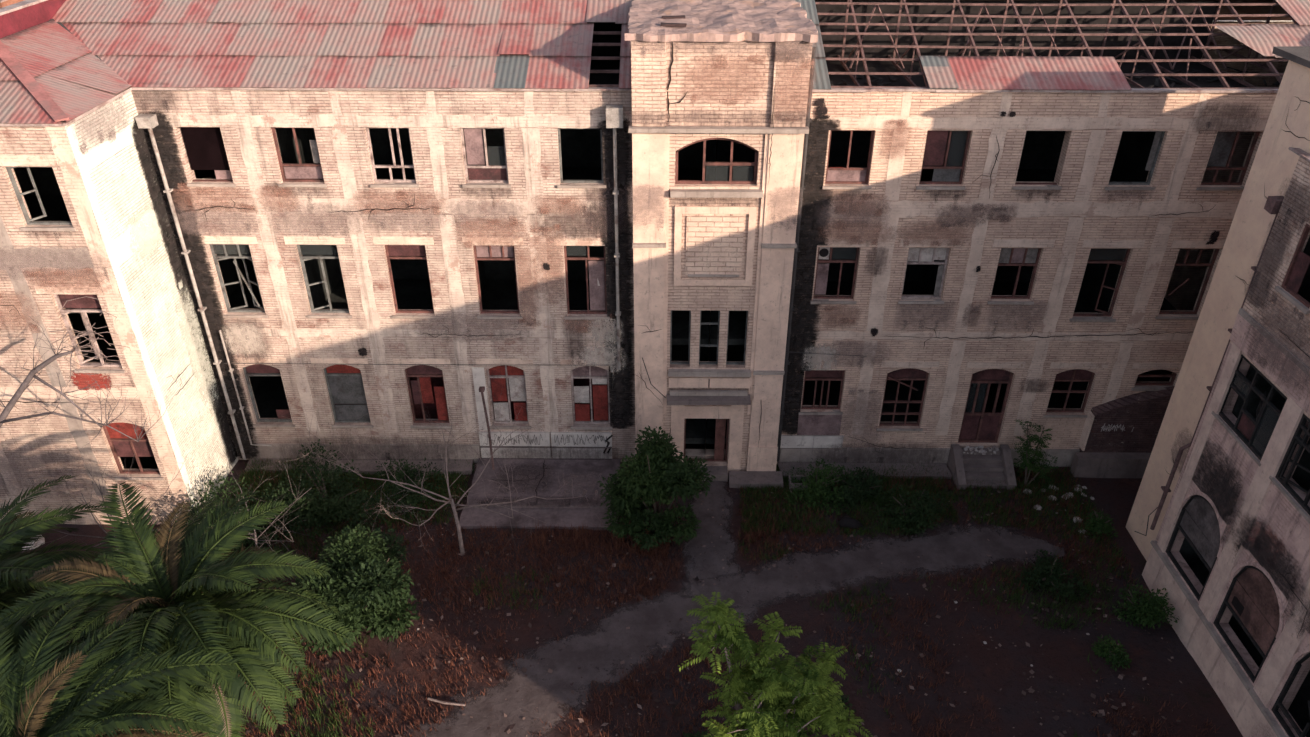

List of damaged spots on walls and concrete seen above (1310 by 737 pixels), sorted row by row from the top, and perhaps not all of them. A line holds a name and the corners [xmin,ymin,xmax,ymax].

crack [667,41,688,122]